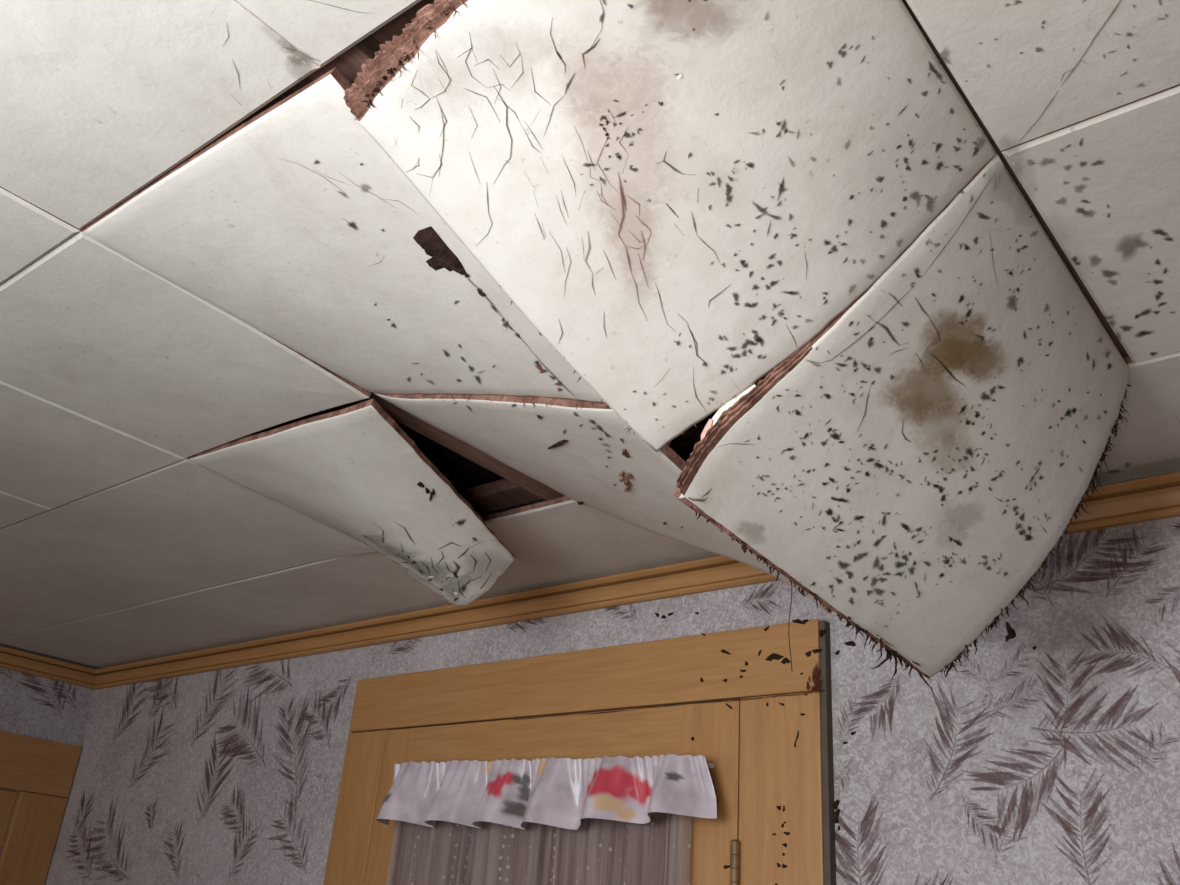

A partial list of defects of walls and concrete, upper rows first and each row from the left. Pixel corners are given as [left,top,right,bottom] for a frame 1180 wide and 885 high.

crack [1024,0,1121,136]
spalling [413,226,469,278]
crack [286,1,730,411]
water stain [711,180,811,374]